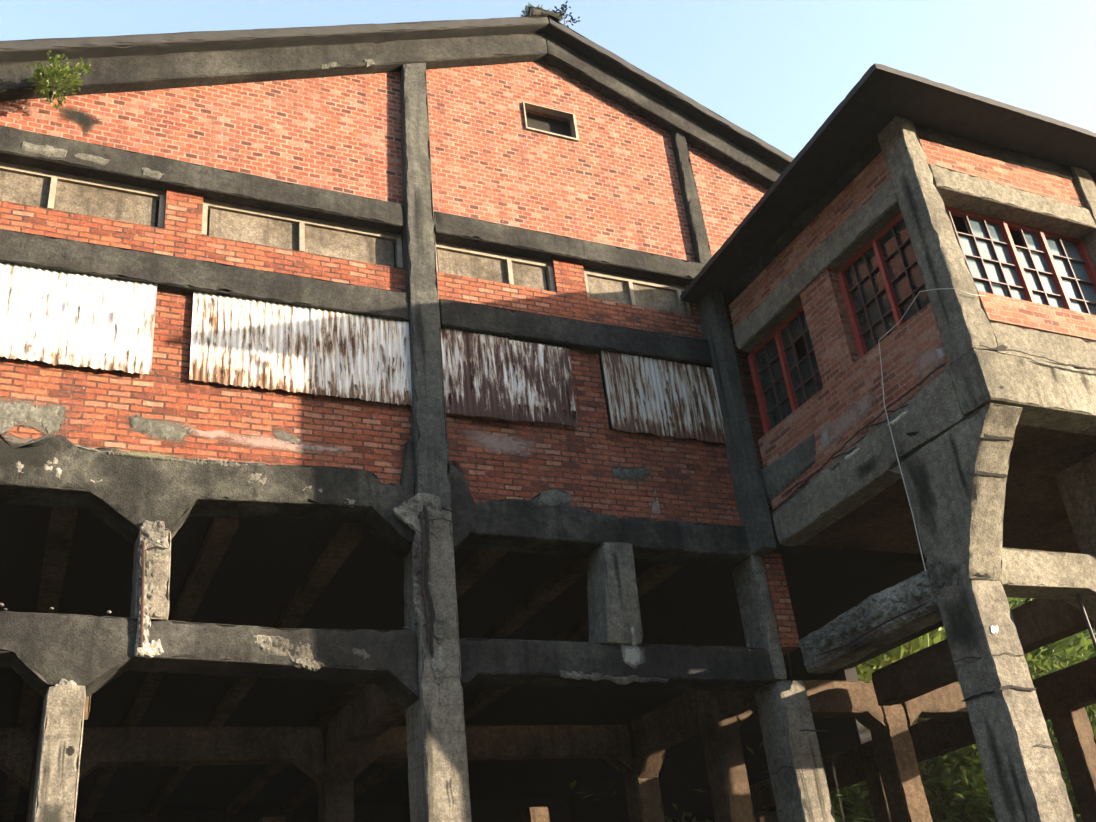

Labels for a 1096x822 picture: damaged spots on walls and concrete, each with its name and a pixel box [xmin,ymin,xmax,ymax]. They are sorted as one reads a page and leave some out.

rust [197,297,218,358]
rust [225,335,290,378]
rust [307,337,355,387]
rust [378,337,406,385]
rust [483,343,526,385]
rust [518,381,576,419]
rust [661,381,721,435]
spalling [134,520,167,659]
spalling [392,493,446,686]
spalling [254,635,327,672]